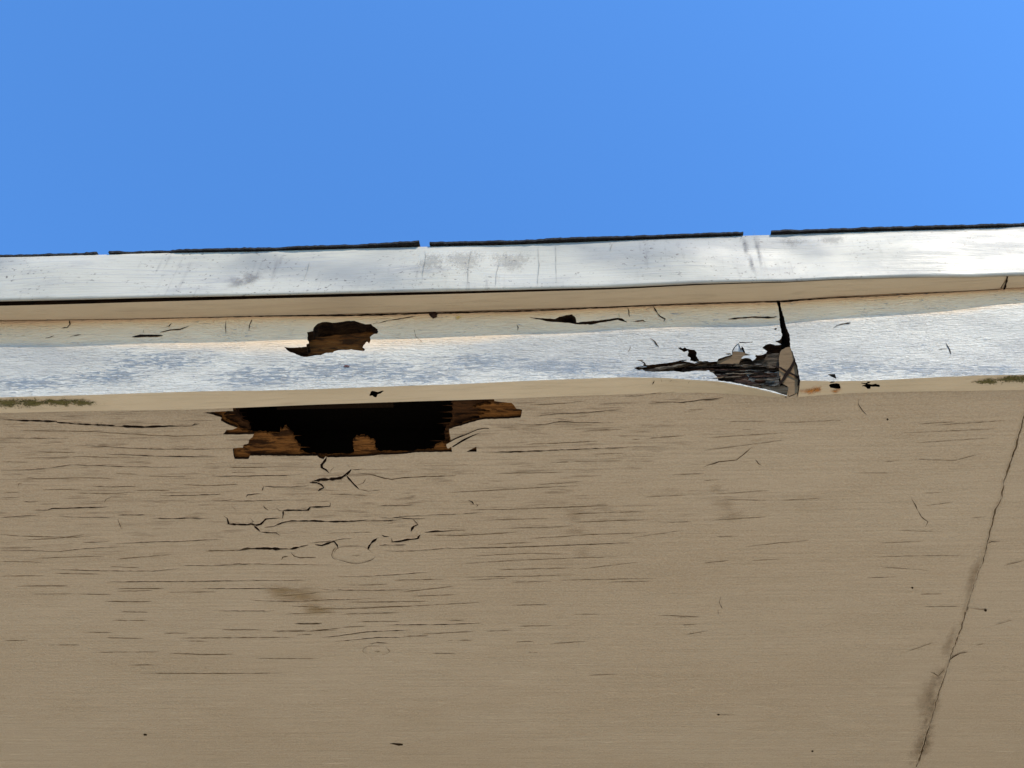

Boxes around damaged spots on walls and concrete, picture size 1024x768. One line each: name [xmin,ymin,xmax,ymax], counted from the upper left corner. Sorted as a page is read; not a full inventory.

crack [132,276,1008,350]
peeling [697,344,761,379]
peeling [777,332,798,397]
spalling [239,391,453,454]
crack [0,382,729,674]
crack [910,413,1024,767]